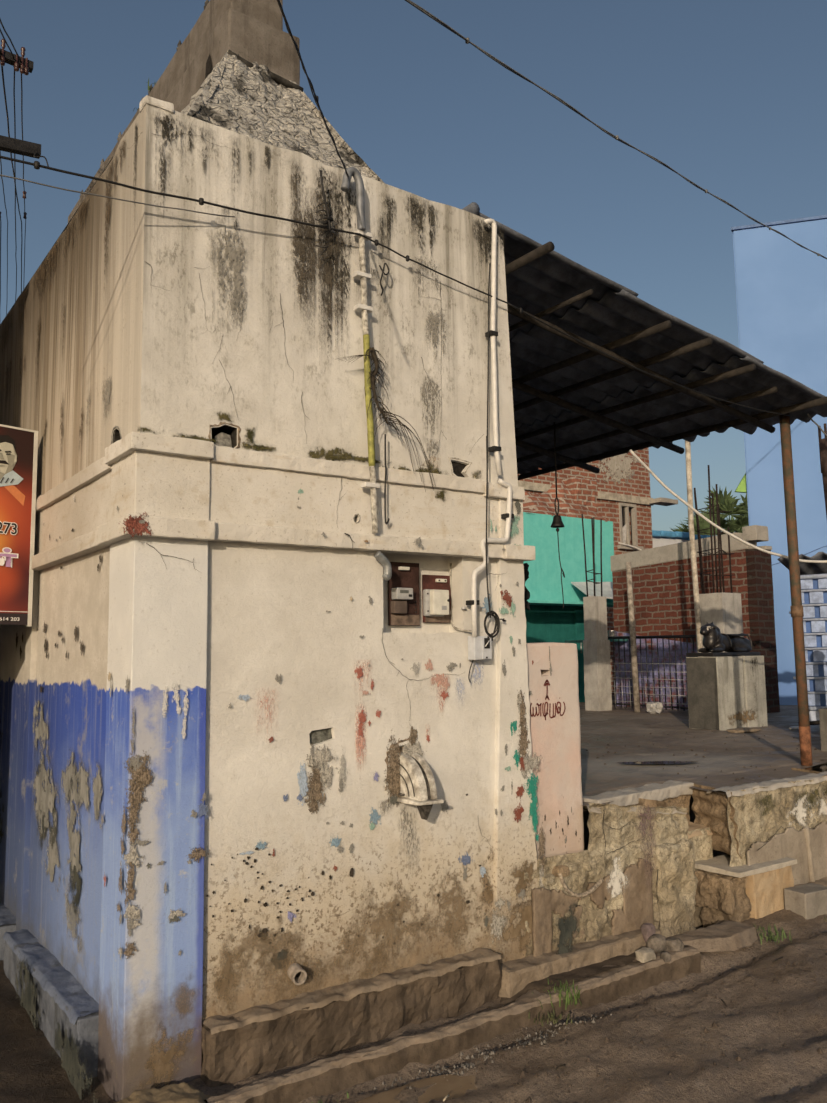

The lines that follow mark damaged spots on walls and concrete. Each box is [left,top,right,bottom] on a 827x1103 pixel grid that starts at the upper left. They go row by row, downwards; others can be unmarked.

leakage [104,126,137,274]
leakage [0,201,88,353]
leakage [291,165,356,349]
spalling [117,484,152,537]
spalling [103,709,164,959]
spalling [283,728,354,853]
peeling [356,710,381,746]
spalling [369,726,430,830]
peeling [401,658,461,700]
spalling [231,842,314,944]
leakage [214,936,246,1008]
leakage [267,940,327,999]